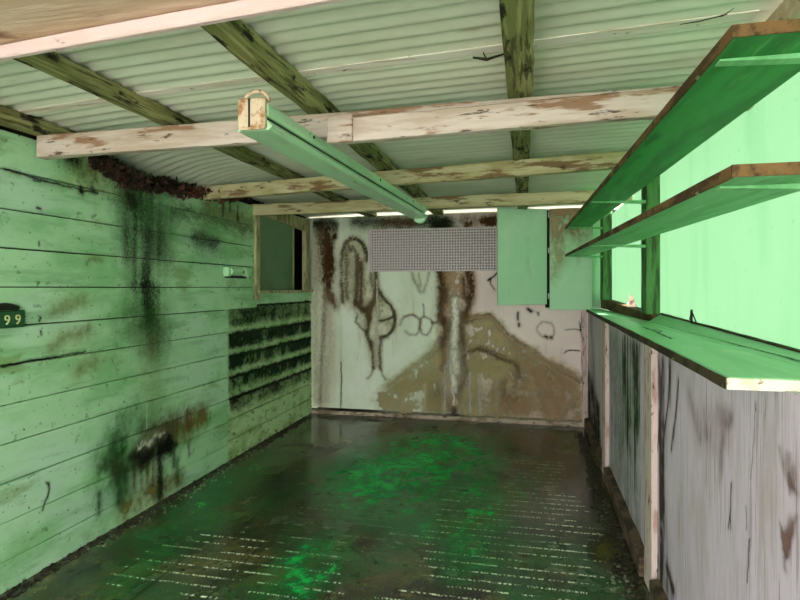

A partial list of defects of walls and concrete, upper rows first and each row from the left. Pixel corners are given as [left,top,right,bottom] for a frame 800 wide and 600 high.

leakage [123,187,169,350]
leakage [192,229,219,250]
leakage [313,219,338,227]
leakage [550,208,581,239]
leakage [339,214,601,444]
leakage [99,407,207,519]
leakage [615,338,640,491]